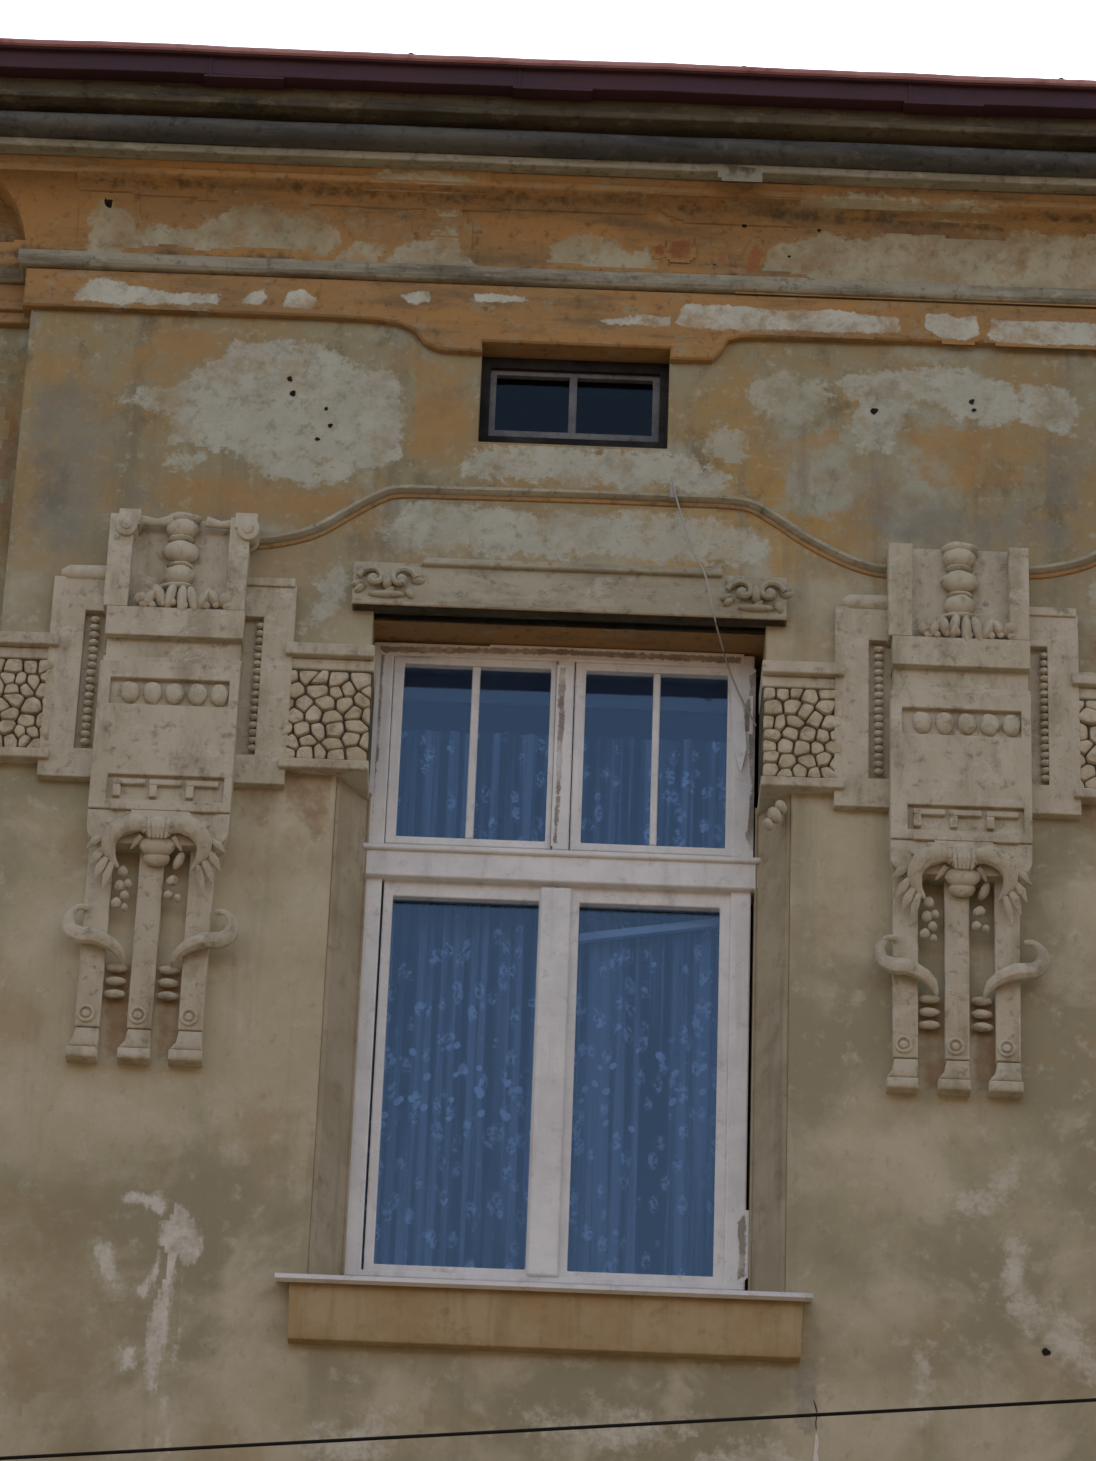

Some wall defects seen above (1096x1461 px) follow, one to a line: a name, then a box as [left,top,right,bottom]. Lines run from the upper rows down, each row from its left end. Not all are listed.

peeling [64,271,320,313]
peeling [77,167,492,266]
peeling [106,329,417,496]
peeling [294,184,1096,643]
water stain [0,1122,209,1461]